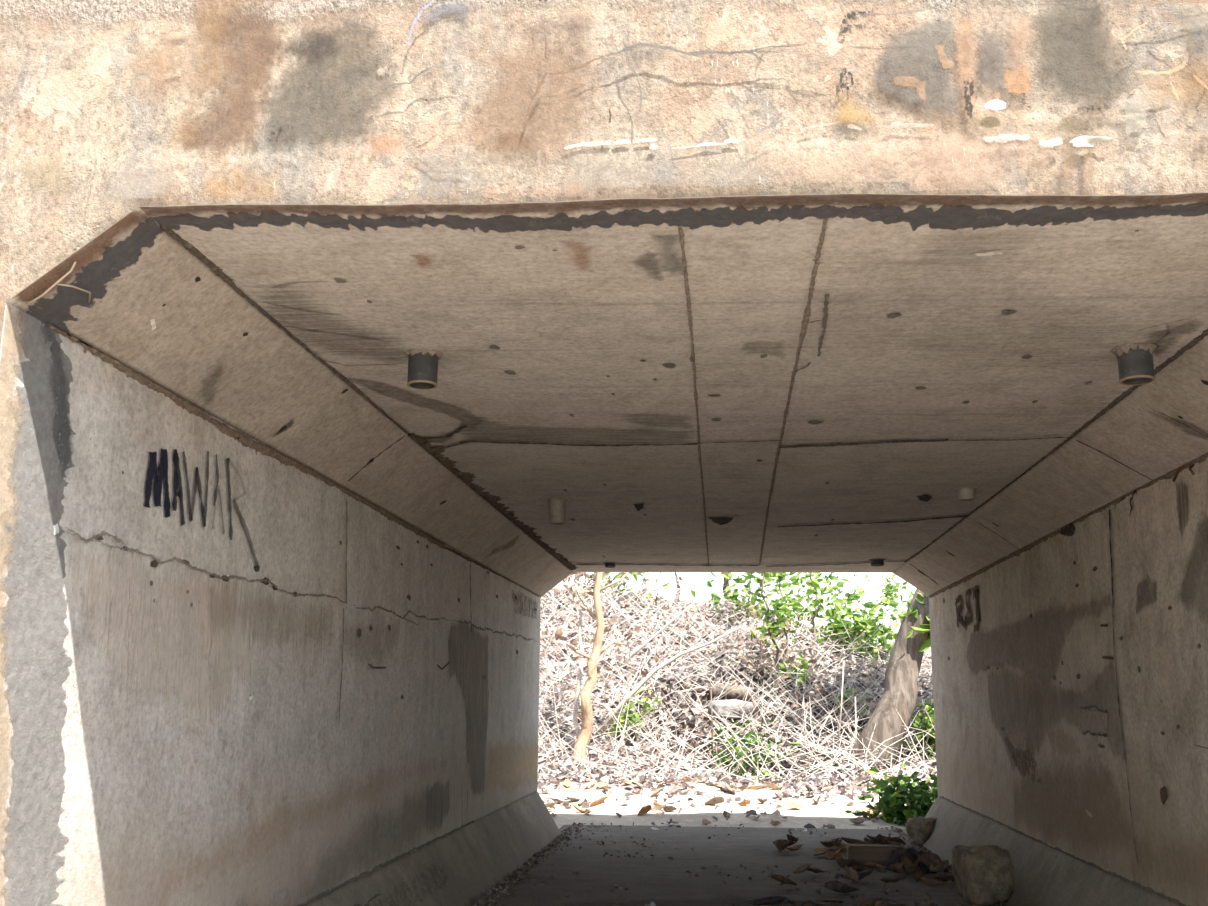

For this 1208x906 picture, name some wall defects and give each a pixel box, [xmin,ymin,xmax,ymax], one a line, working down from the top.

leakage [268,26,389,145]
crack [524,11,836,123]
crack [730,86,783,137]
leakage [983,134,1112,147]
leakage [1041,0,1147,133]
leakage [0,193,1208,855]
crack [68,529,538,642]